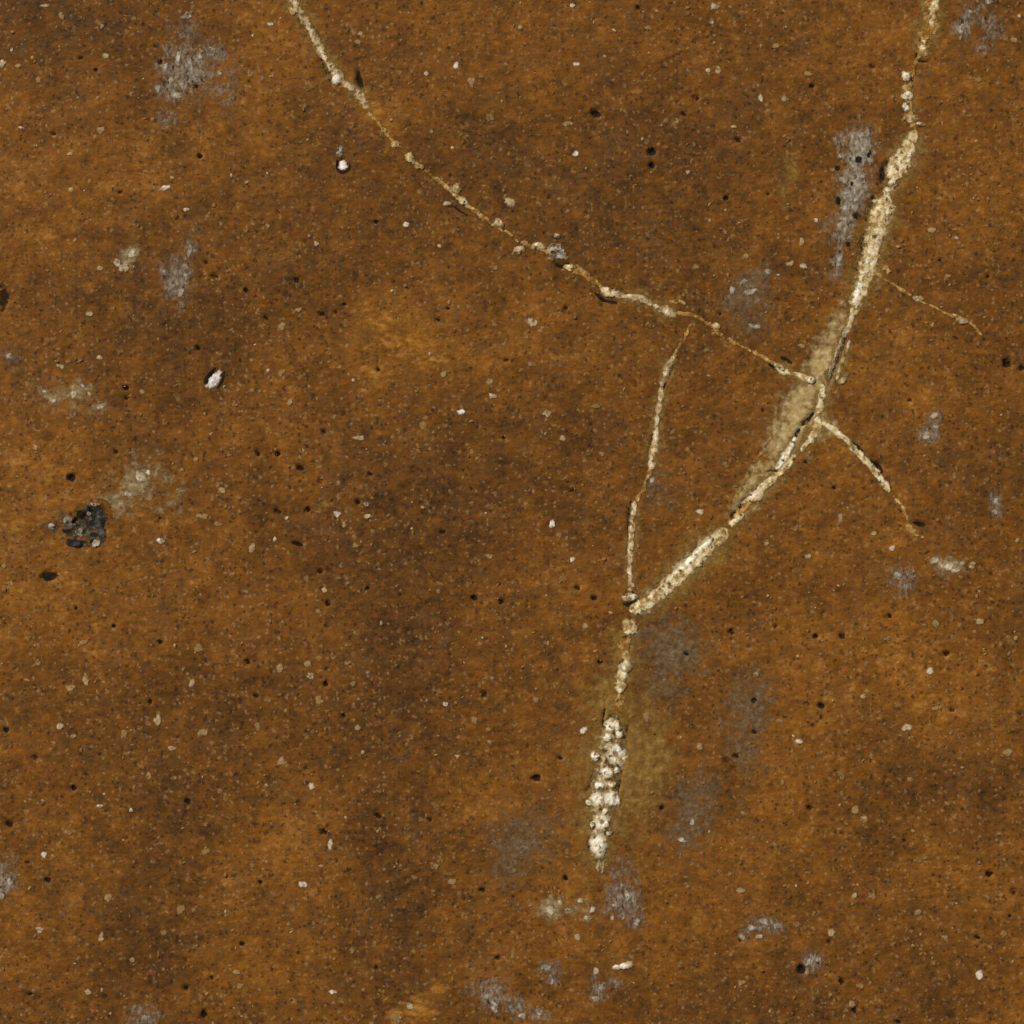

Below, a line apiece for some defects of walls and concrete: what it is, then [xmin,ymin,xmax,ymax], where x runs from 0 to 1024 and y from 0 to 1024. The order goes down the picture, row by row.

crack [283,0,982,874]
water stain [639,300,847,608]
water stain [580,676,670,835]